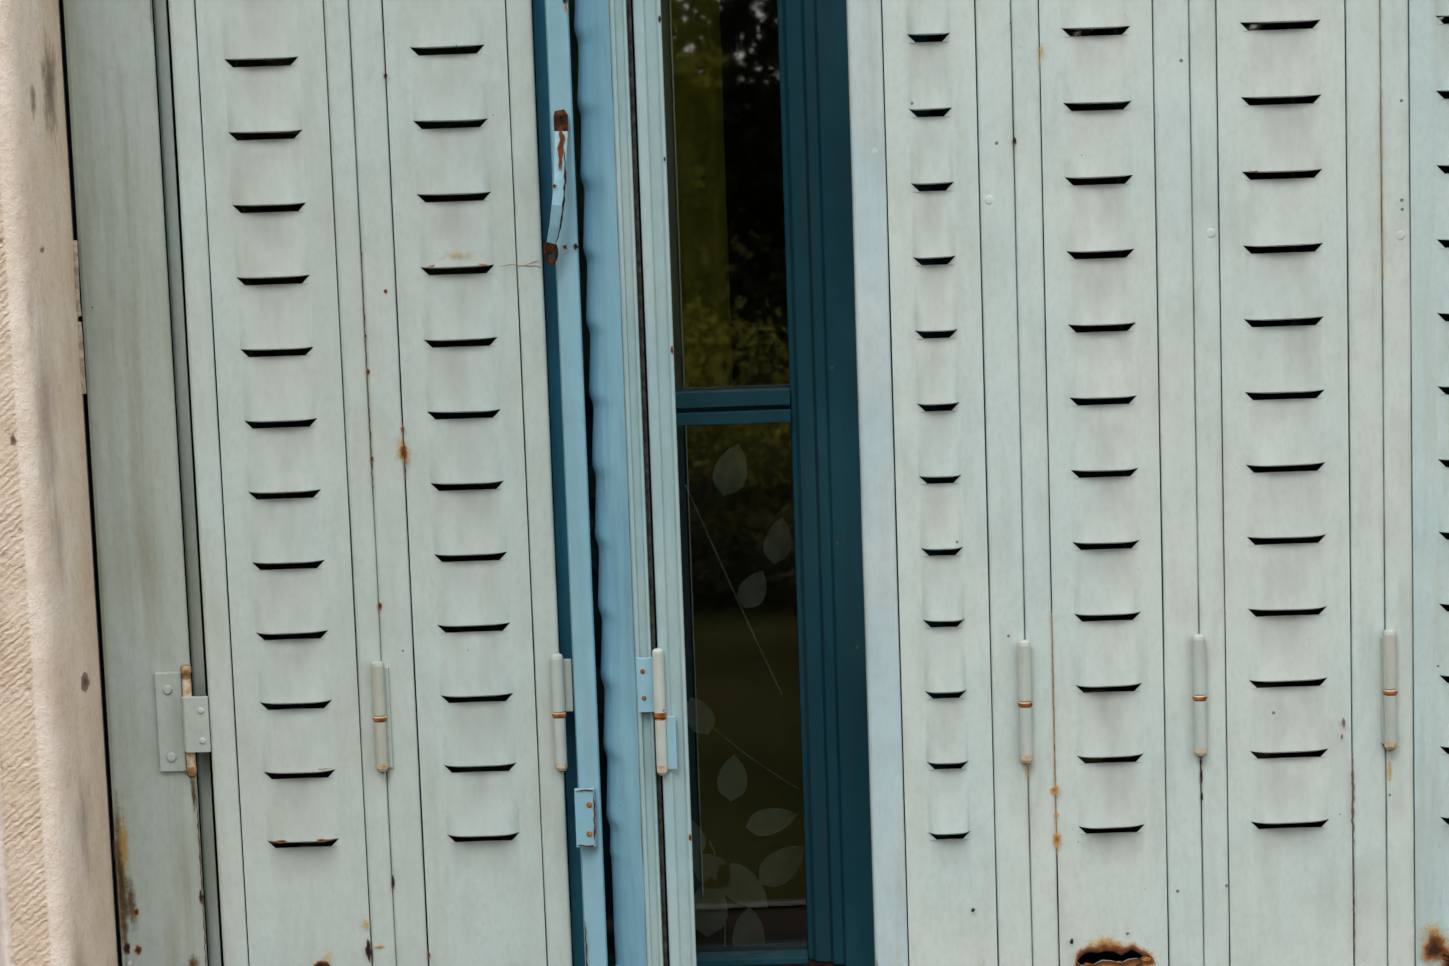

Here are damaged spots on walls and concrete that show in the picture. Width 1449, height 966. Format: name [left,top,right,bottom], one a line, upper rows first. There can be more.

corrosion [552,126,578,250]
corrosion [115,814,142,965]
corrosion [1423,926,1449,966]